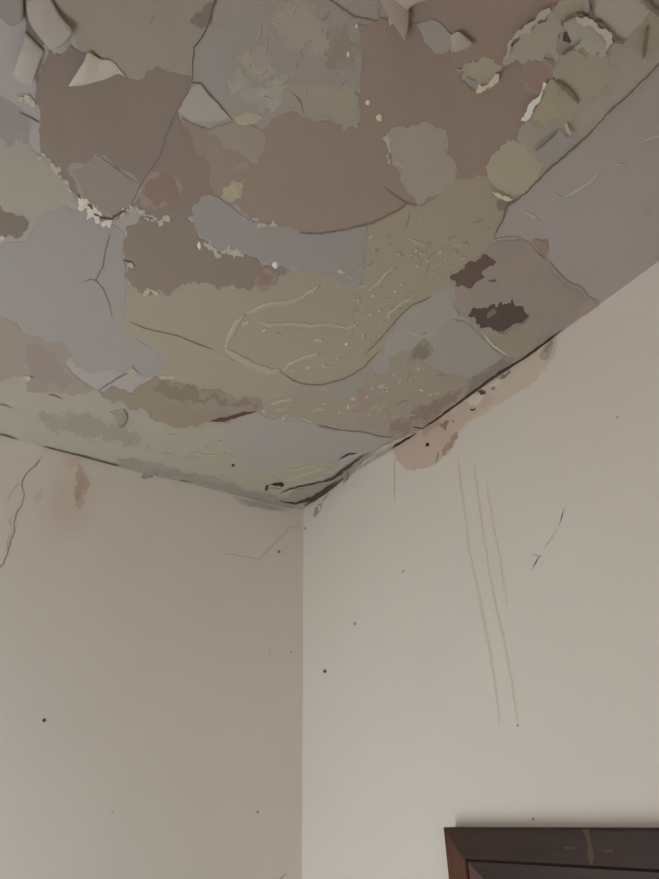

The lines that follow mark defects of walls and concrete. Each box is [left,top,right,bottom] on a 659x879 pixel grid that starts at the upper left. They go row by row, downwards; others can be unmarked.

crack [192,0,231,118]
crack [329,0,375,22]
crack [77,111,177,315]
flaking render [0,0,659,517]
crack [299,186,418,235]
crack [132,323,212,349]
leakage [388,356,515,438]
crack [0,458,41,567]